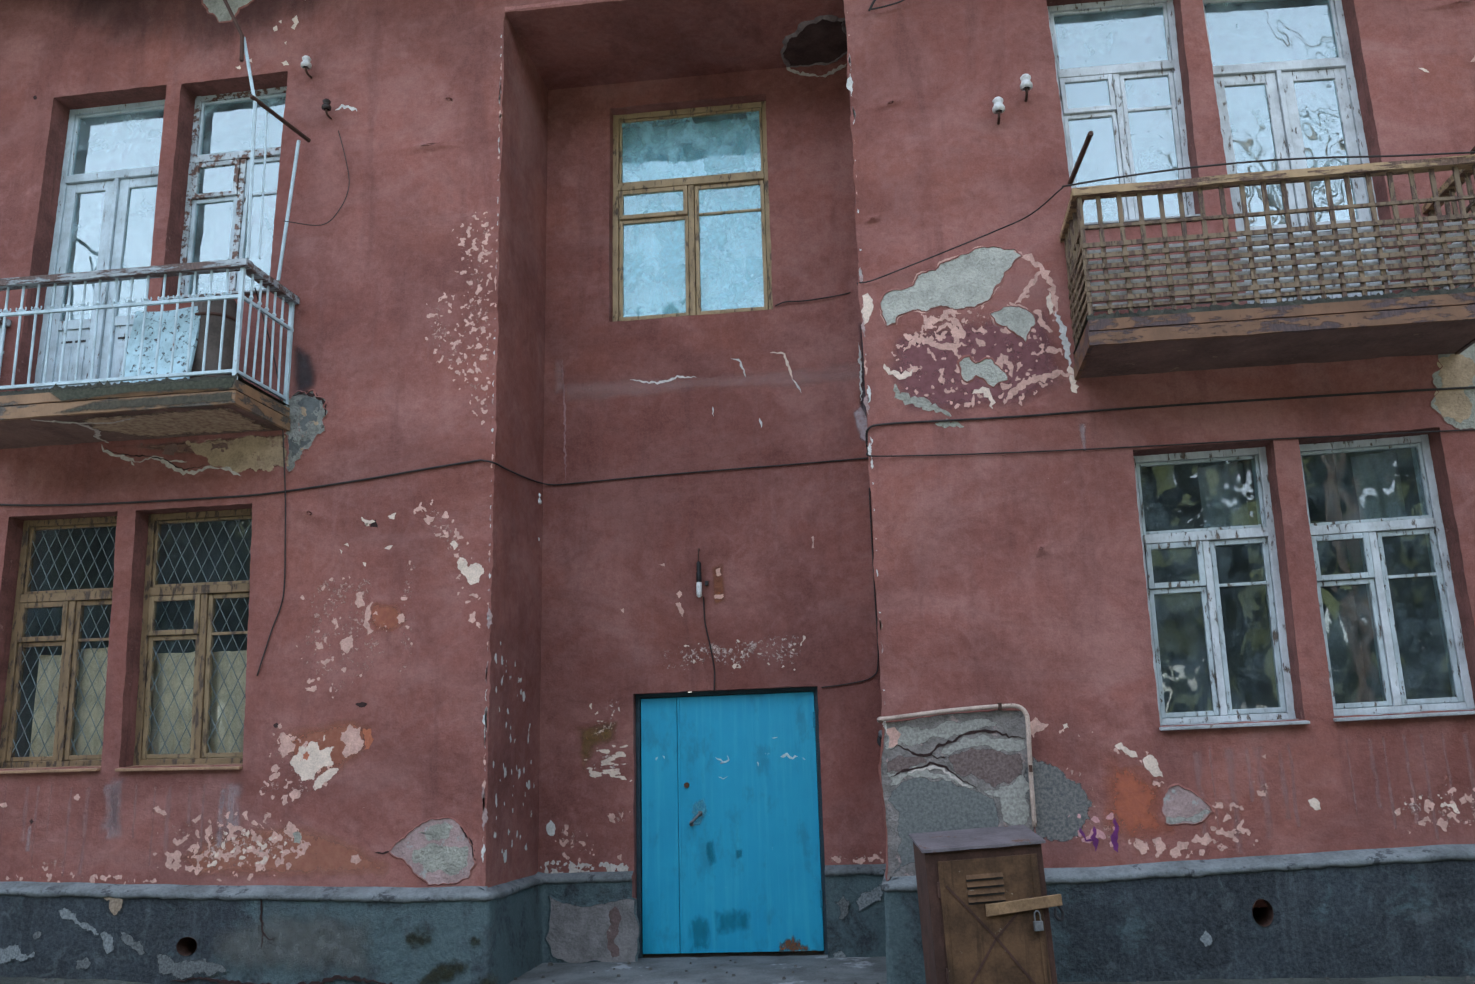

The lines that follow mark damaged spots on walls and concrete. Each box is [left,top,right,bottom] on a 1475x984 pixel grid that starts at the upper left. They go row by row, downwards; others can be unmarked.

flaking render [505,0,592,11]
flaking render [780,12,856,124]
peeling [859,244,1079,428]
flaking render [1429,343,1475,432]
crack [31,418,240,476]
peeling [0,35,532,980]
peeling [584,695,632,782]
crack [889,729,1025,788]
peeling [540,820,629,873]
flaking render [831,690,1258,920]
peeling [1394,787,1475,834]
flaking render [544,895,641,963]